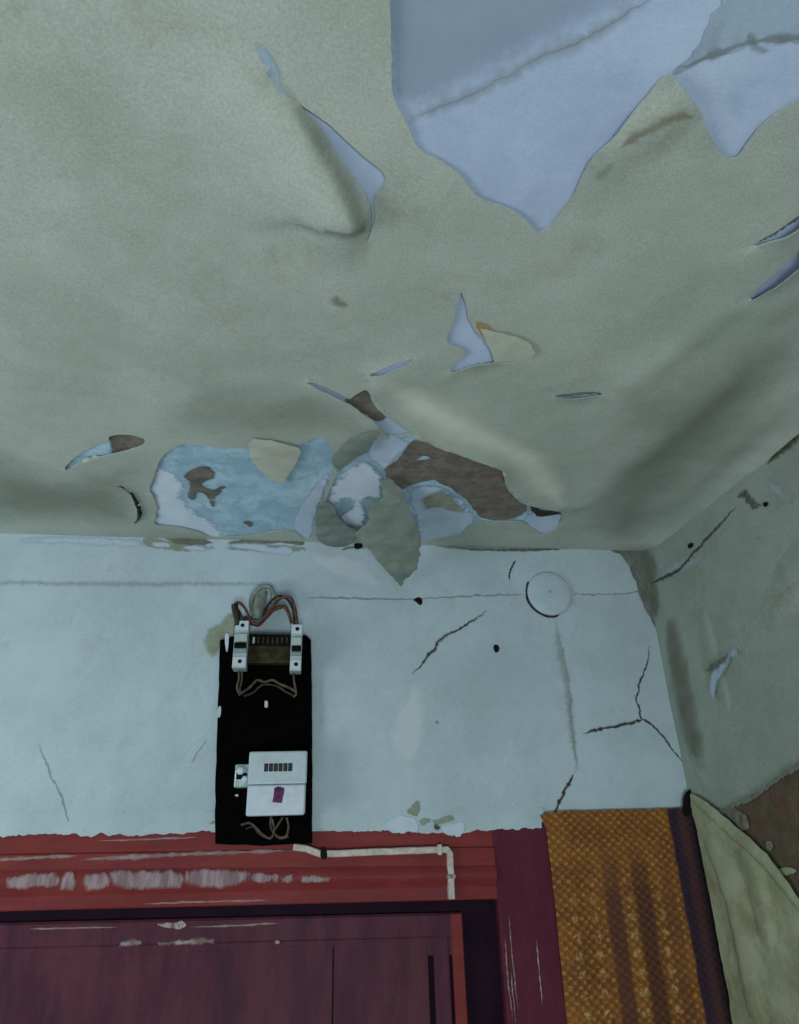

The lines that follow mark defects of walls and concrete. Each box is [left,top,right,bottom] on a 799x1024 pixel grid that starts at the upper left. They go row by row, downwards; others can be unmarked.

crack [768,434,799,463]
peeling [23,537,213,551]
peeling [229,540,305,555]
crack [651,490,760,583]
crack [413,615,482,673]
crack [583,646,682,761]